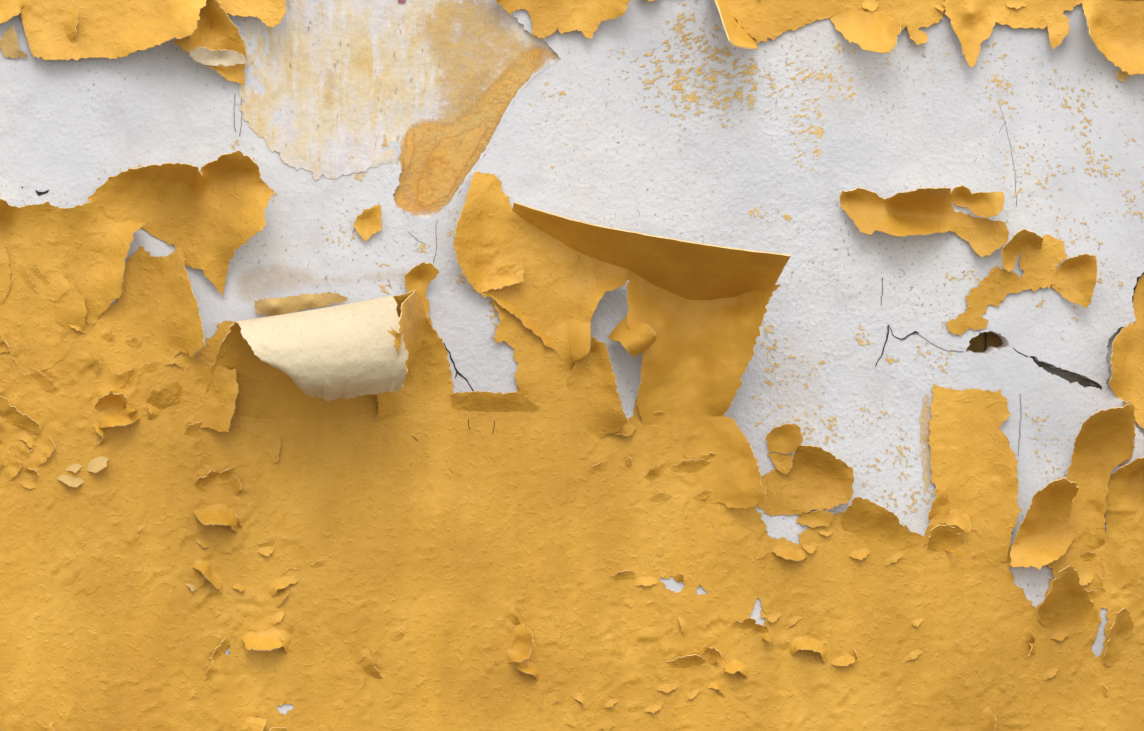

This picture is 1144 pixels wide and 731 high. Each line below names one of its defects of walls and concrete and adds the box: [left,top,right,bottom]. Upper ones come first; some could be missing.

peeling [0,0,1144,570]
crack [875,278,964,366]
crack [1013,348,1102,388]
peeling [192,539,244,595]
peeling [204,576,300,681]
peeling [277,704,294,715]
peeling [355,647,384,679]
peeling [610,570,707,595]
peeling [643,647,749,714]
peeling [729,598,858,667]
peeling [1009,565,1054,608]
peeling [1078,551,1108,658]